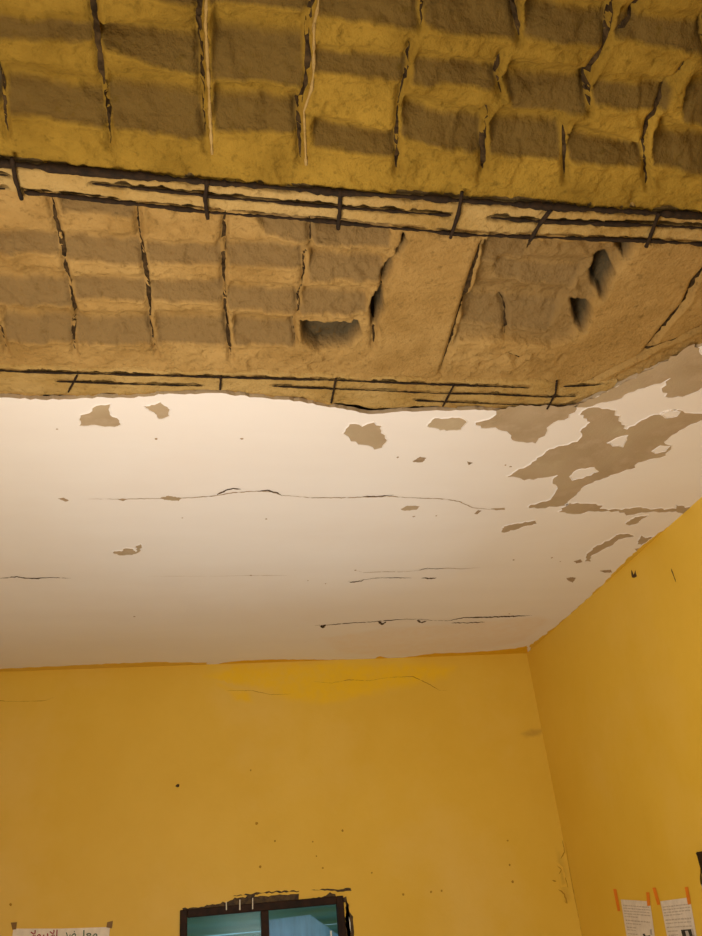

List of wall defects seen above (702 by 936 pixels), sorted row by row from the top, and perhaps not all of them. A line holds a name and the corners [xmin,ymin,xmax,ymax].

spalling [0,0,702,563]
crack [192,488,490,510]
crack [320,615,529,628]